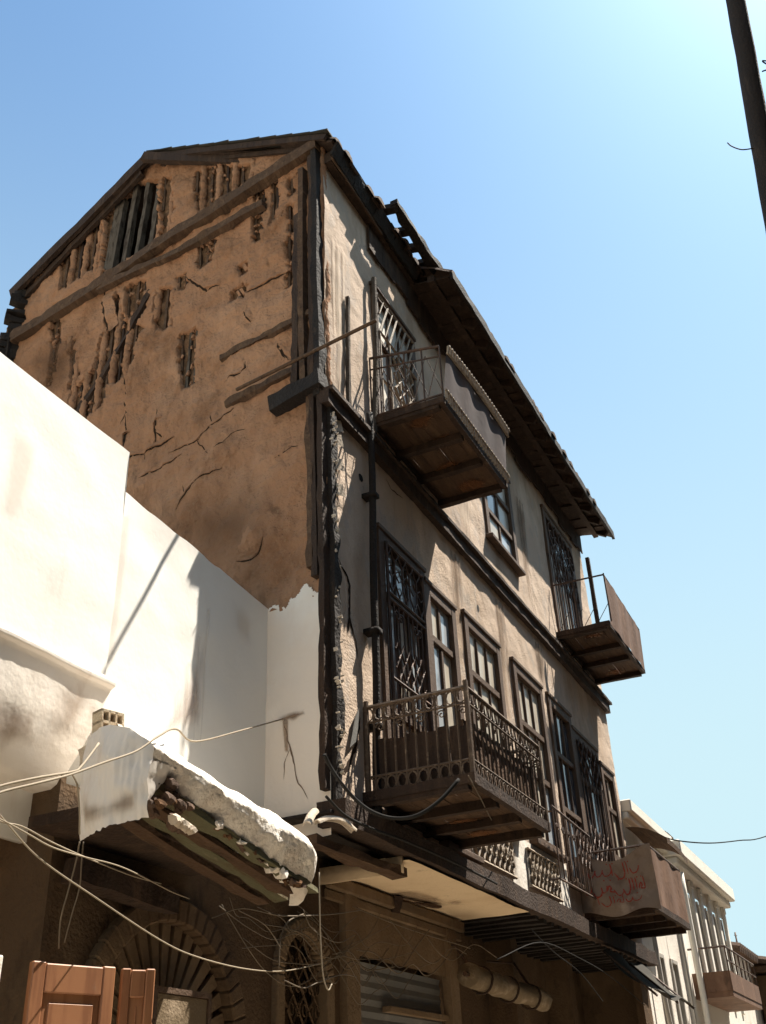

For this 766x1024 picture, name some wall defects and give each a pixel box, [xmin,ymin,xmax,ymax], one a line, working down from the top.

spalling [192,158,255,210]
spalling [60,212,114,288]
crack [186,270,223,292]
spalling [247,179,296,288]
spalling [48,274,198,419]
crack [117,374,244,510]
crack [236,537,263,562]
peeling [327,406,360,800]
spalling [147,776,198,835]
spalling [213,820,307,888]